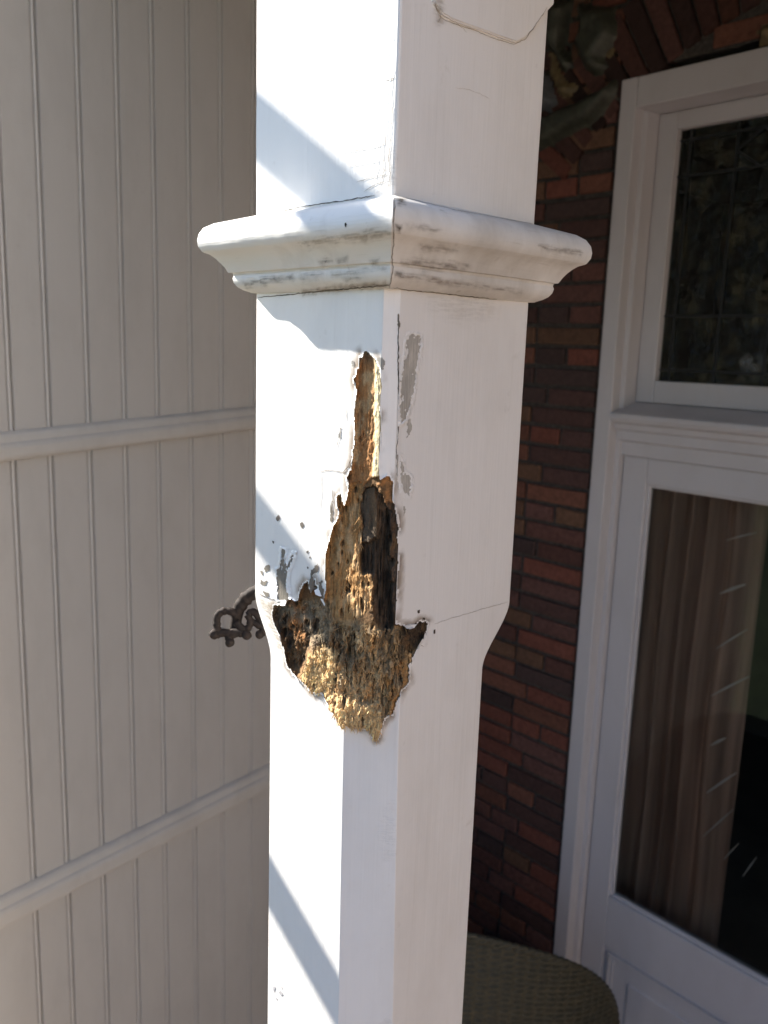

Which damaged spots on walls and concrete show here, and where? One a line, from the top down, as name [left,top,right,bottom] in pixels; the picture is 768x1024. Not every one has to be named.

peeling [397,314,424,438]
peeling [330,472,349,522]
peeling [260,541,325,606]
spalling [361,453,435,677]